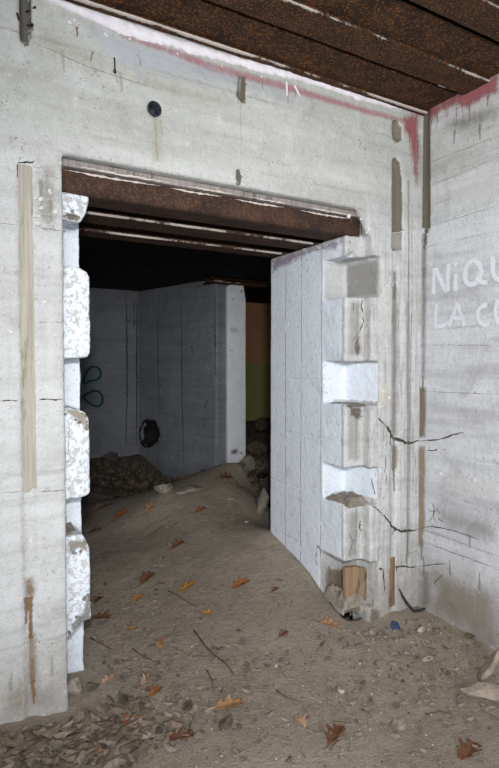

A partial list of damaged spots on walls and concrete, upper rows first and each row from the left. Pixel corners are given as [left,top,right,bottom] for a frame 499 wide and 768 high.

spalling [139,419,161,450]
crack [371,418,487,589]